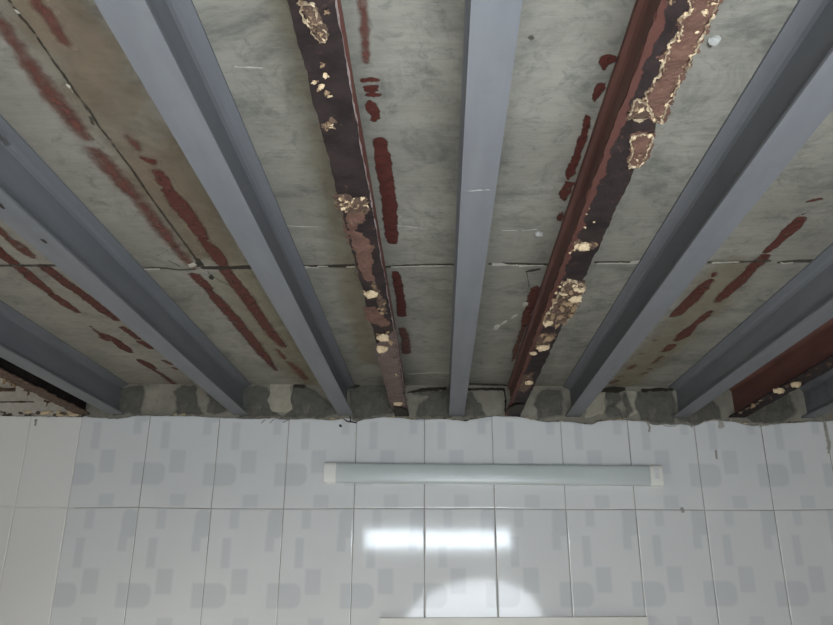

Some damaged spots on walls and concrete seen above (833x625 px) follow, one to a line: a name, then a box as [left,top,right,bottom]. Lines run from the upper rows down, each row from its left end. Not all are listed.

peeling [659,0,719,73]
peeling [631,80,680,123]
crack [0,0,252,286]
peeling [569,242,598,254]
crack [304,262,355,270]
crack [386,262,454,270]
crack [488,262,548,284]
crack [594,258,636,266]
crack [707,257,814,265]
peeling [530,279,586,356]
peeling [702,368,817,426]
flaking render [0,400,85,417]